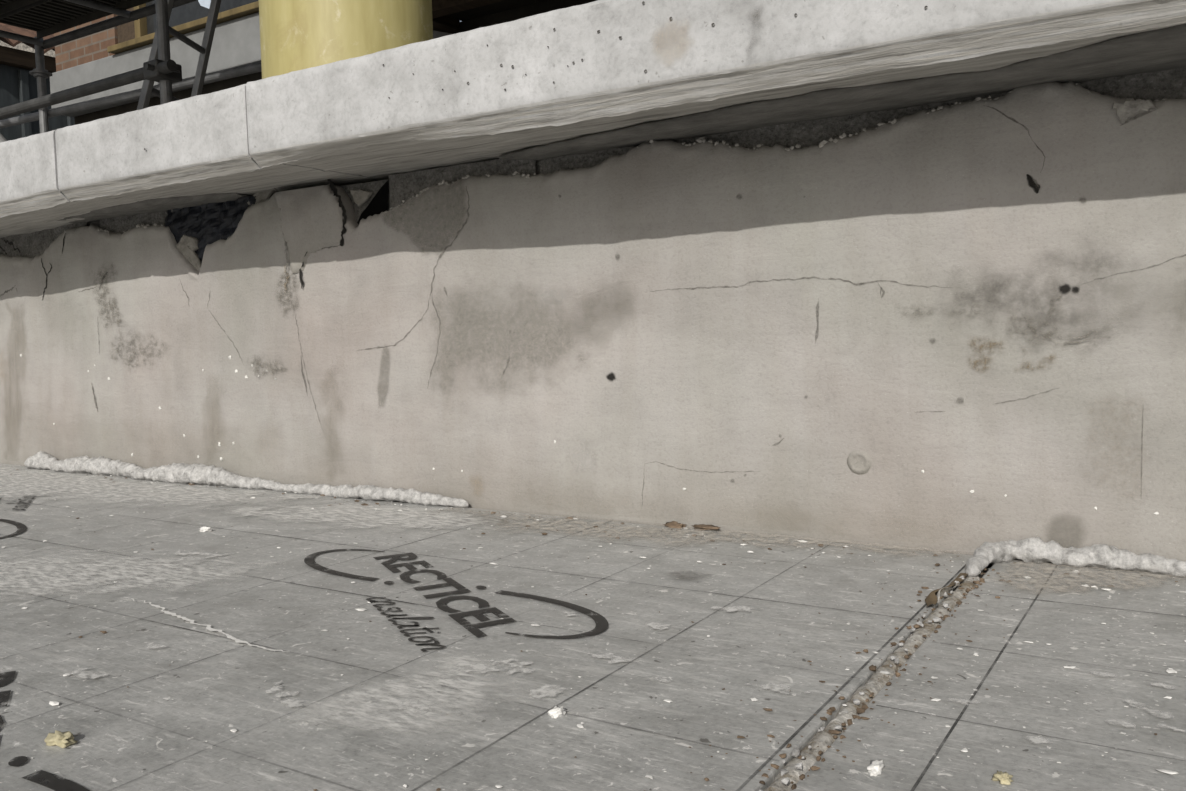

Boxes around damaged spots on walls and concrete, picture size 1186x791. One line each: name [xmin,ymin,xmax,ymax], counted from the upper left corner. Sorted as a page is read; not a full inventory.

spalling [671,91,1012,151]
spalling [1076,67,1186,125]
spalling [0,190,276,271]
crack [322,179,389,249]
spalling [383,140,653,213]
spalling [1027,174,1040,193]
crack [366,192,469,388]